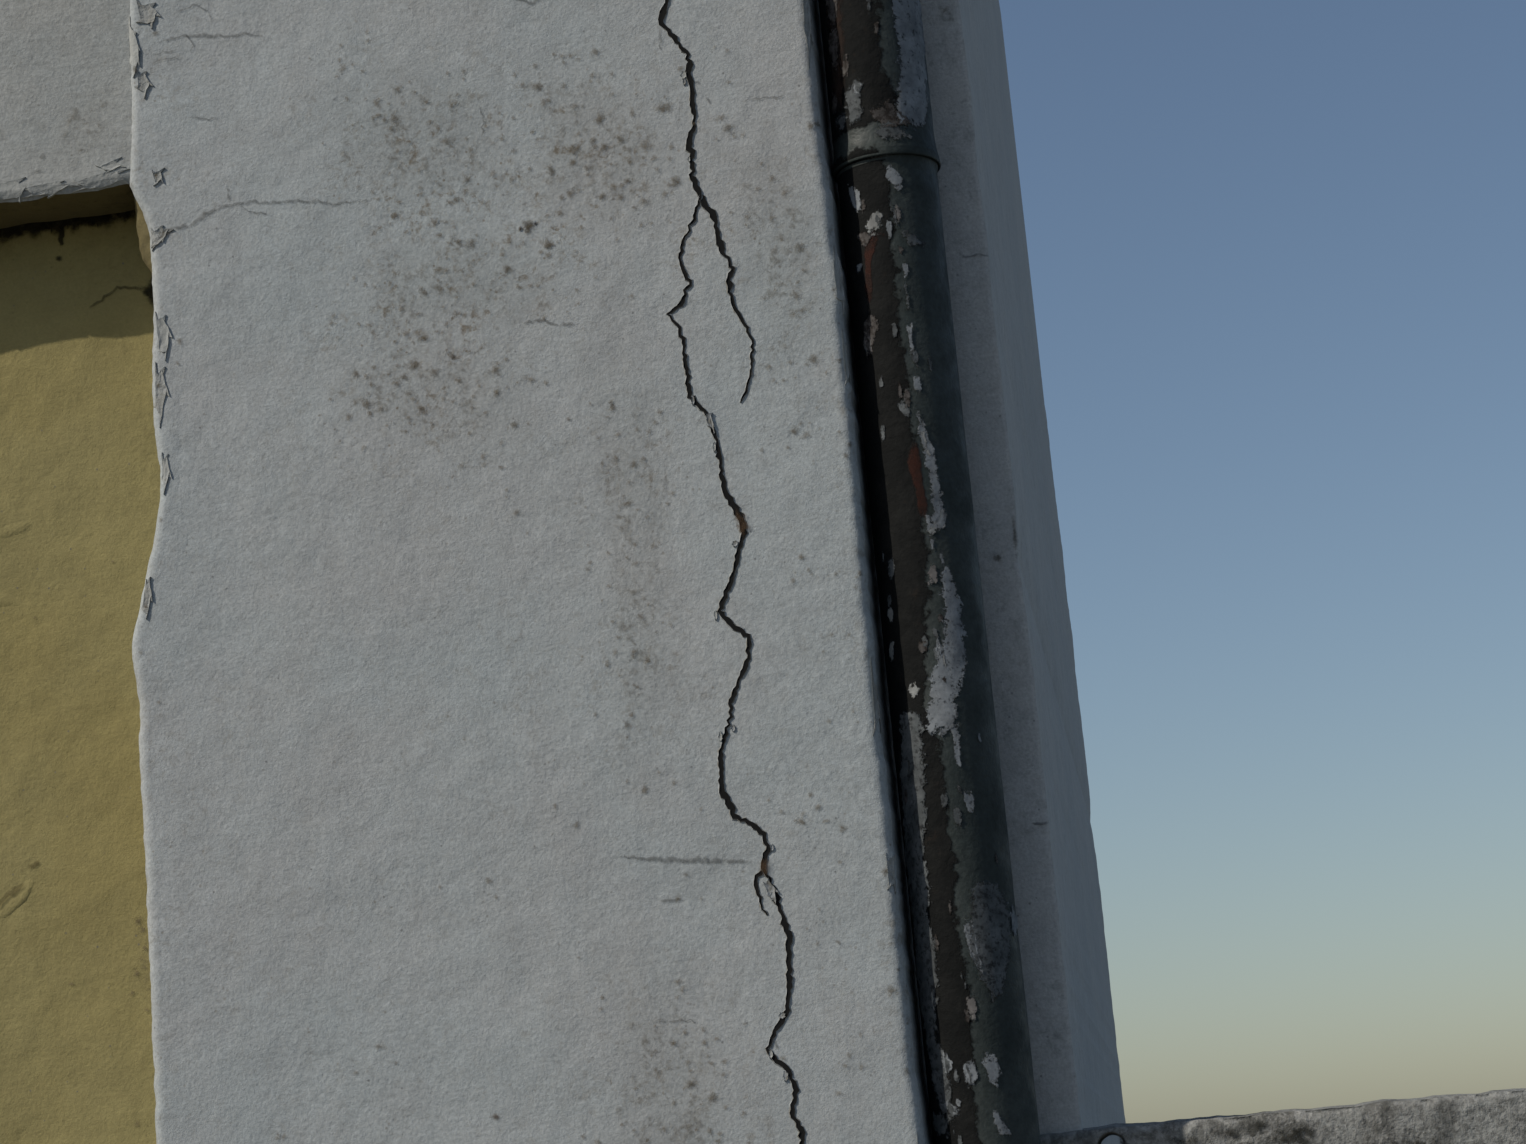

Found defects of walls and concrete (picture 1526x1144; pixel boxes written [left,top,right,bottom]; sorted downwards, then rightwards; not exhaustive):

water stain [0,211,136,242]
water stain [144,283,154,305]
crack [658,0,806,1144]
peeling [803,0,1018,1144]
water stain [1255,1122,1313,1144]